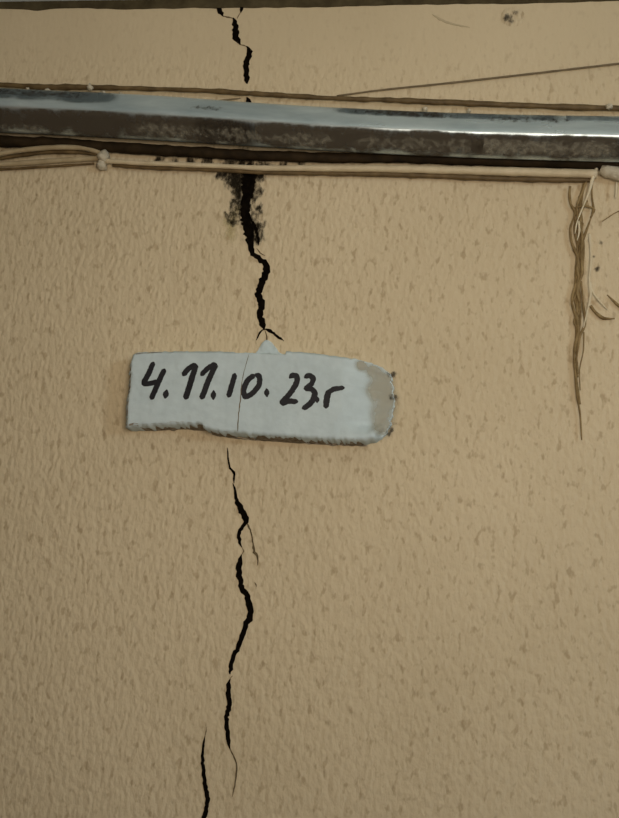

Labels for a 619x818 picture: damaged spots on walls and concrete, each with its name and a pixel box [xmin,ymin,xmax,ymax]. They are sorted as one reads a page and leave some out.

crack [237,163,284,431]
crack [201,448,259,818]